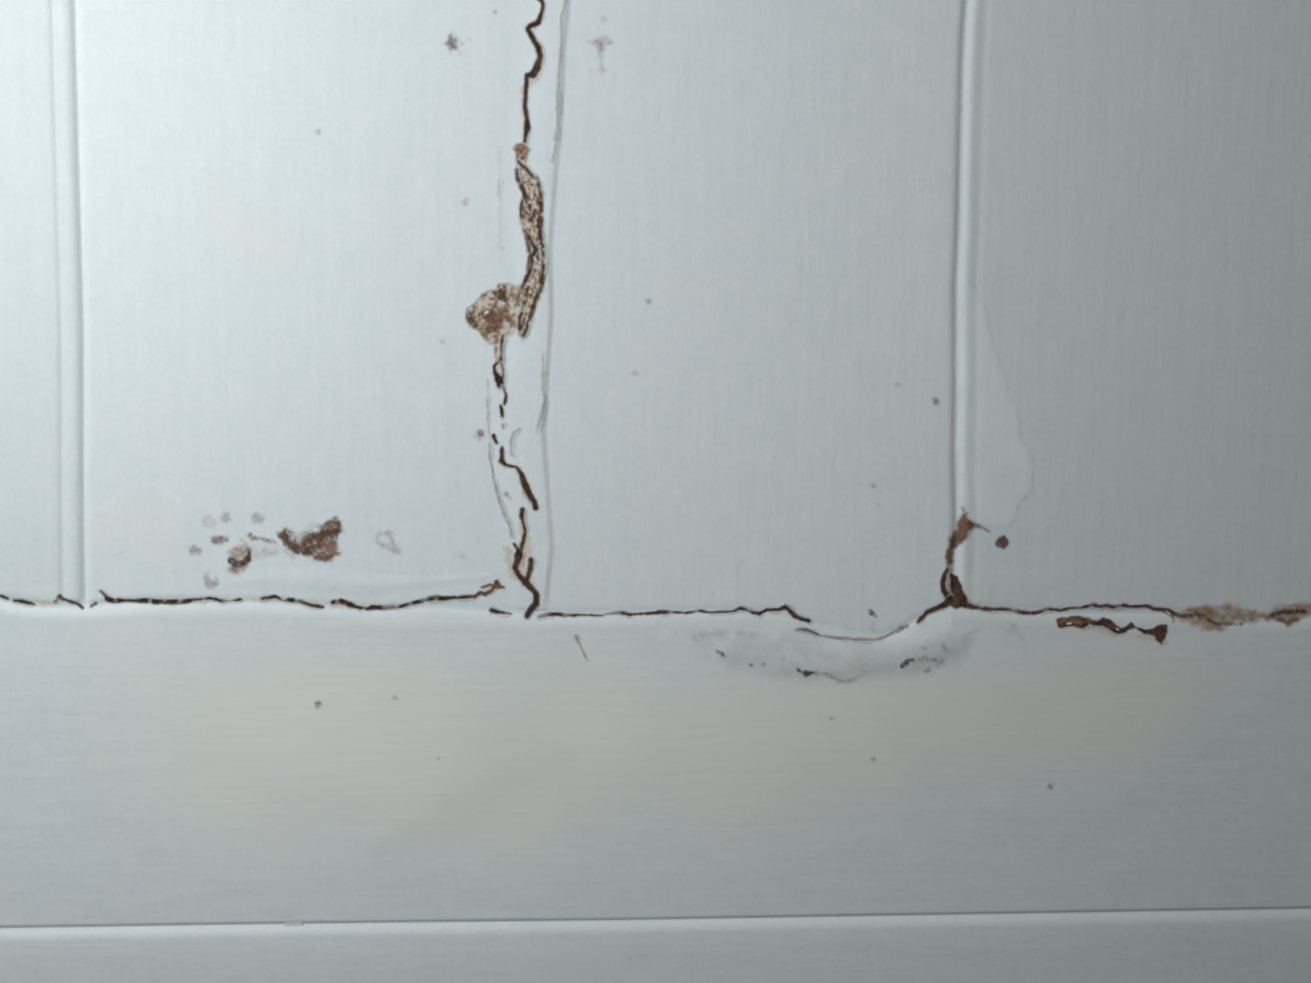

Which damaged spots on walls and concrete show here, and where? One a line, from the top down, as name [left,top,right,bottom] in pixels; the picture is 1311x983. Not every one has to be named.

crack [523,0,544,143]
crack [0,335,893,640]
corrosion [228,520,340,571]
corrosion [899,514,1009,629]
crack [973,603,1193,618]
corrosion [1175,604,1311,630]